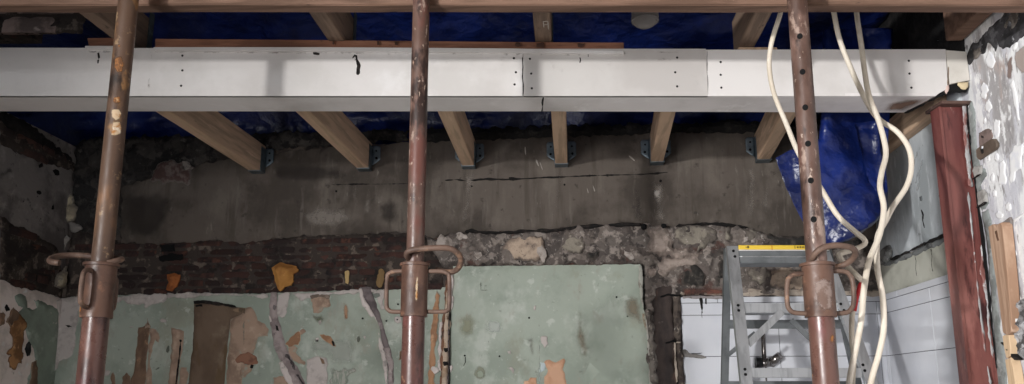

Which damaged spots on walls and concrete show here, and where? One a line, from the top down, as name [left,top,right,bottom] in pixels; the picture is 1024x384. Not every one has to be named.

spalling [361,127,451,144]
crack [445,172,668,181]
flaking render [0,97,407,384]
spalling [832,238,881,297]
spalling [415,223,805,384]